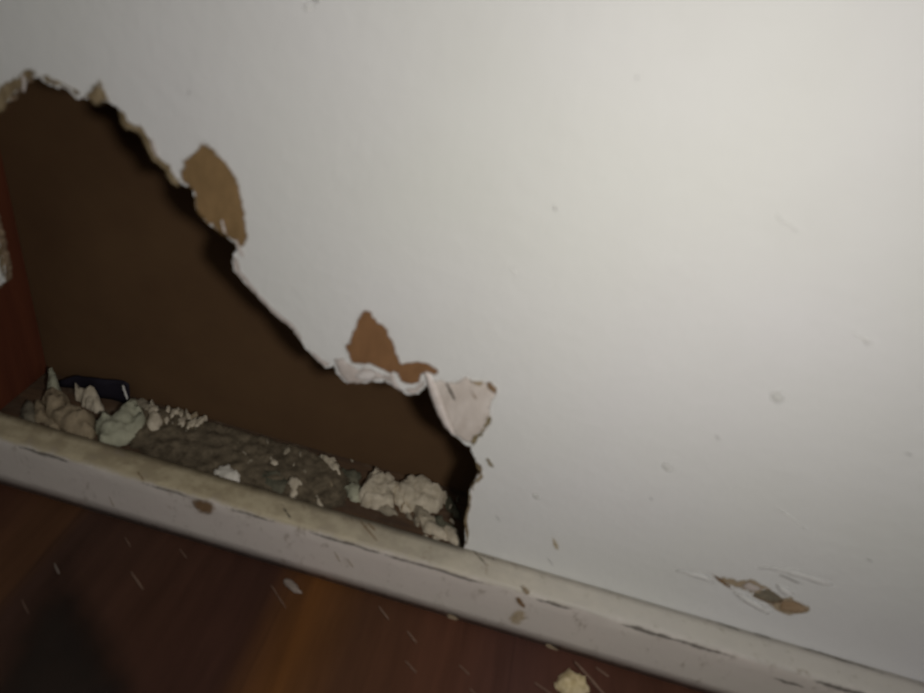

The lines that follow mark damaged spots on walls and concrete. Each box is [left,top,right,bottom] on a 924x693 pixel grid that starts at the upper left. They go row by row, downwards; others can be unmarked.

peeling [181,145,247,246]
spalling [345,311,496,446]
peeling [193,500,213,514]
spalling [677,570,810,615]